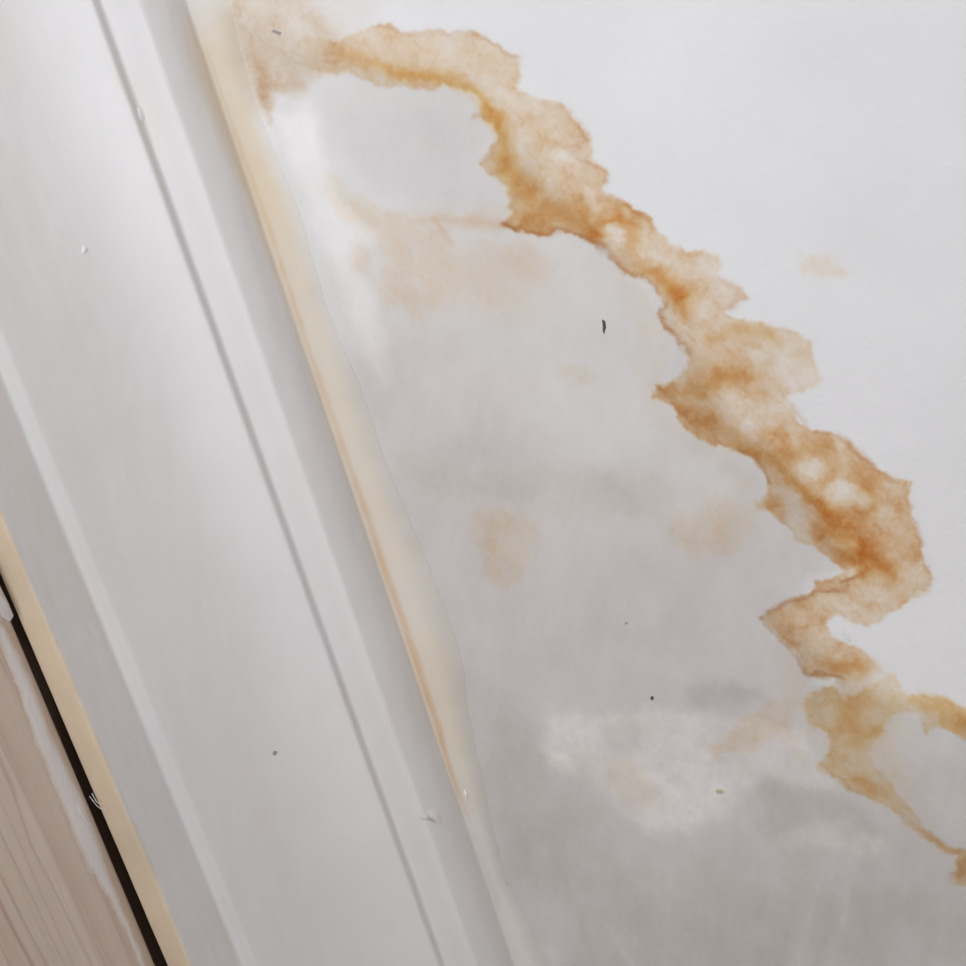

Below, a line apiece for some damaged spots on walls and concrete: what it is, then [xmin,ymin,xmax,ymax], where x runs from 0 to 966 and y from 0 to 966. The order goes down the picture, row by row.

leakage [228,0,966,966]